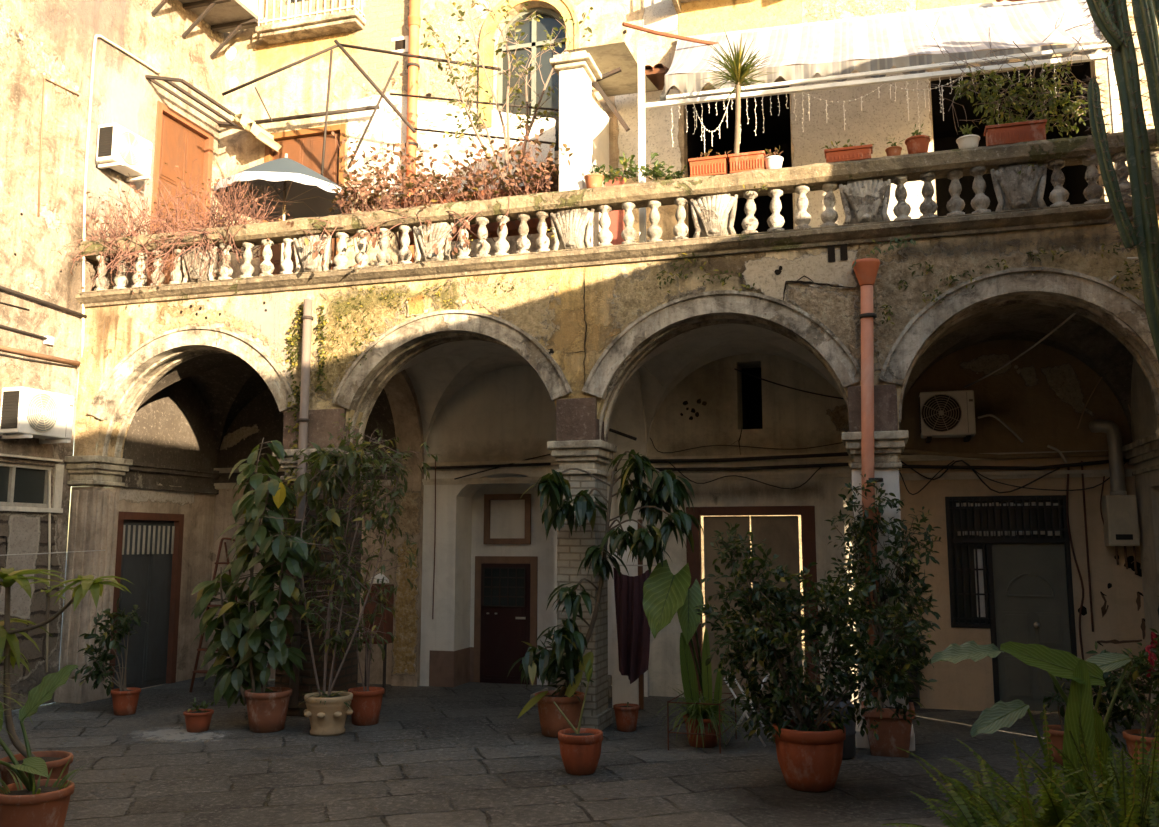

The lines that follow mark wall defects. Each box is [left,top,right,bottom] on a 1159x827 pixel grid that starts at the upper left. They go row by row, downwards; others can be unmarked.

damp [243,298,283,342]
crack [574,268,587,384]
spalling [606,261,683,332]
spalling [786,237,1146,375]